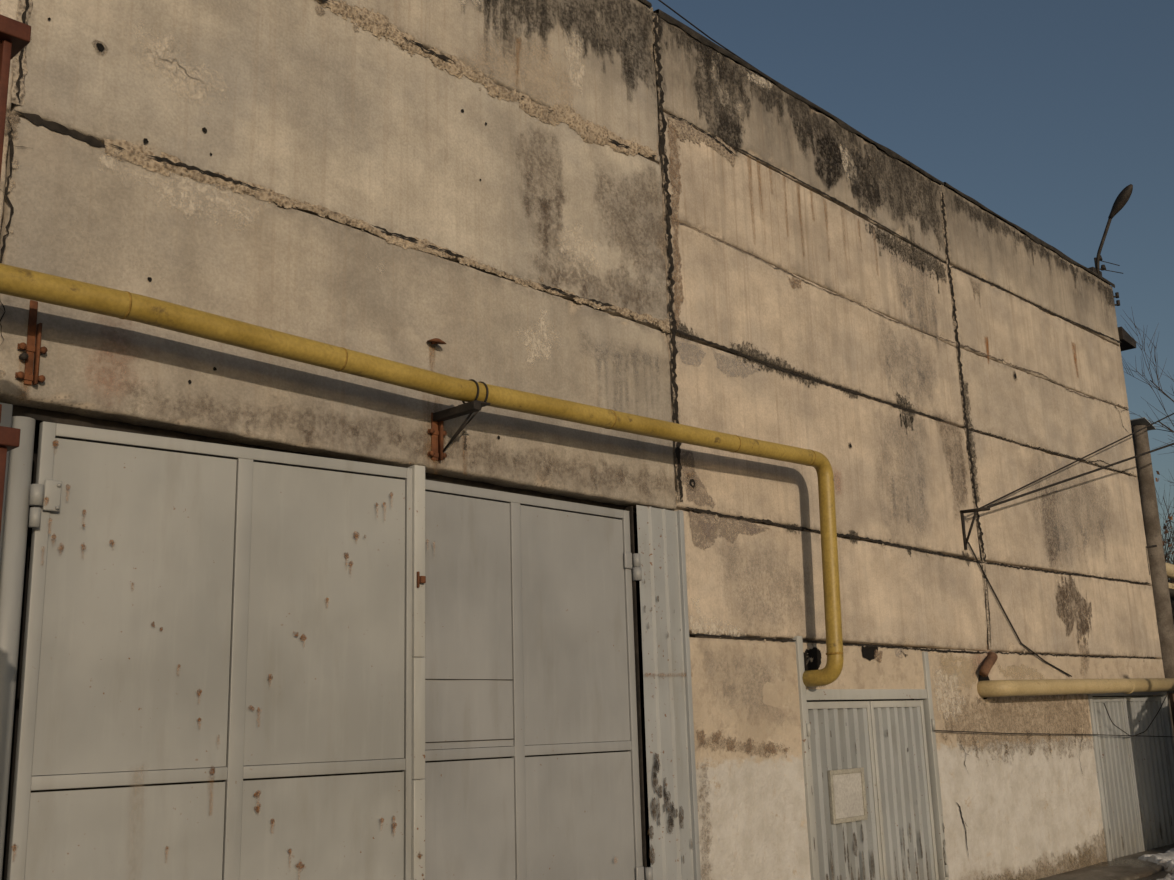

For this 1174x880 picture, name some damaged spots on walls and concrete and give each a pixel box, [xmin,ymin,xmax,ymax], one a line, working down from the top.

spalling [4,0,33,138]
crack [0,117,27,263]
spalling [104,0,737,424]
leakage [795,124,815,154]
leakage [840,146,857,185]
peeling [675,442,769,550]
leakage [1056,572,1092,643]